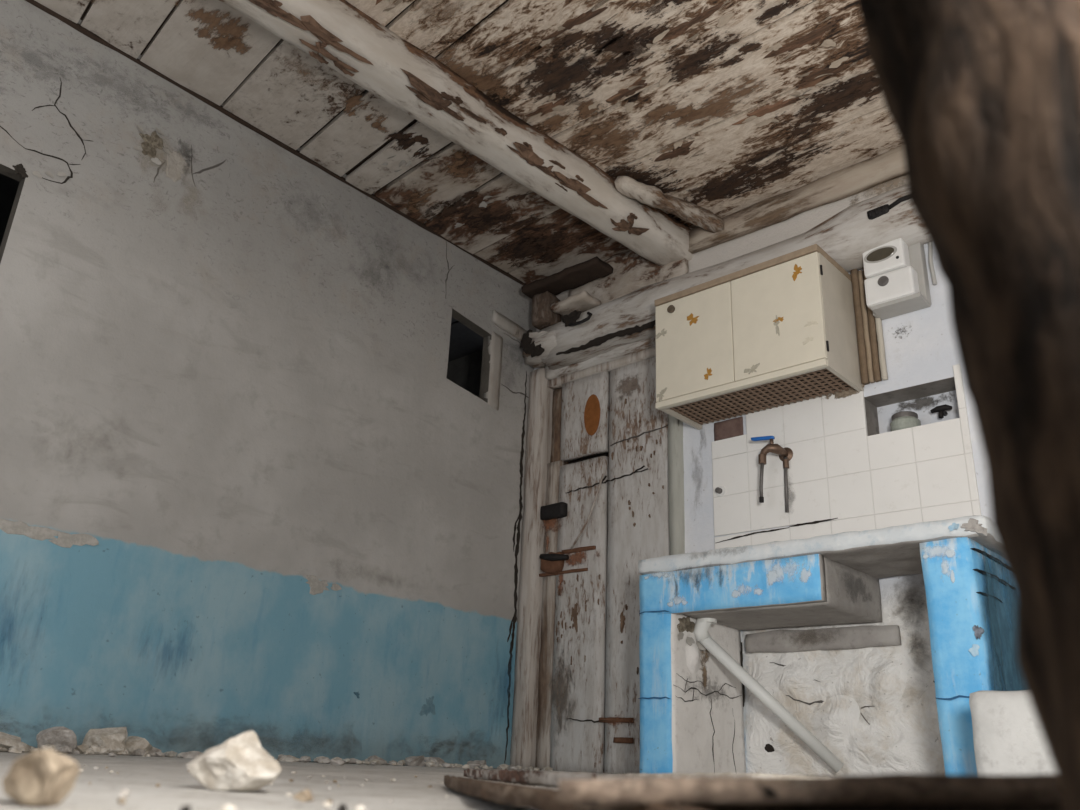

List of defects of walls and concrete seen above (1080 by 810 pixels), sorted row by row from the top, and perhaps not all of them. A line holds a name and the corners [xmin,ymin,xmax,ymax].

crack [0,78,91,184]
spalling [133,125,188,182]
peeling [249,0,373,76]
peeling [400,68,649,236]
peeling [540,0,618,58]
peeling [525,73,672,123]
peeling [654,137,706,166]
peeling [646,0,735,48]
peeling [732,15,853,127]
crack [502,371,529,764]
peeling [732,562,811,598]
crack [638,642,745,773]